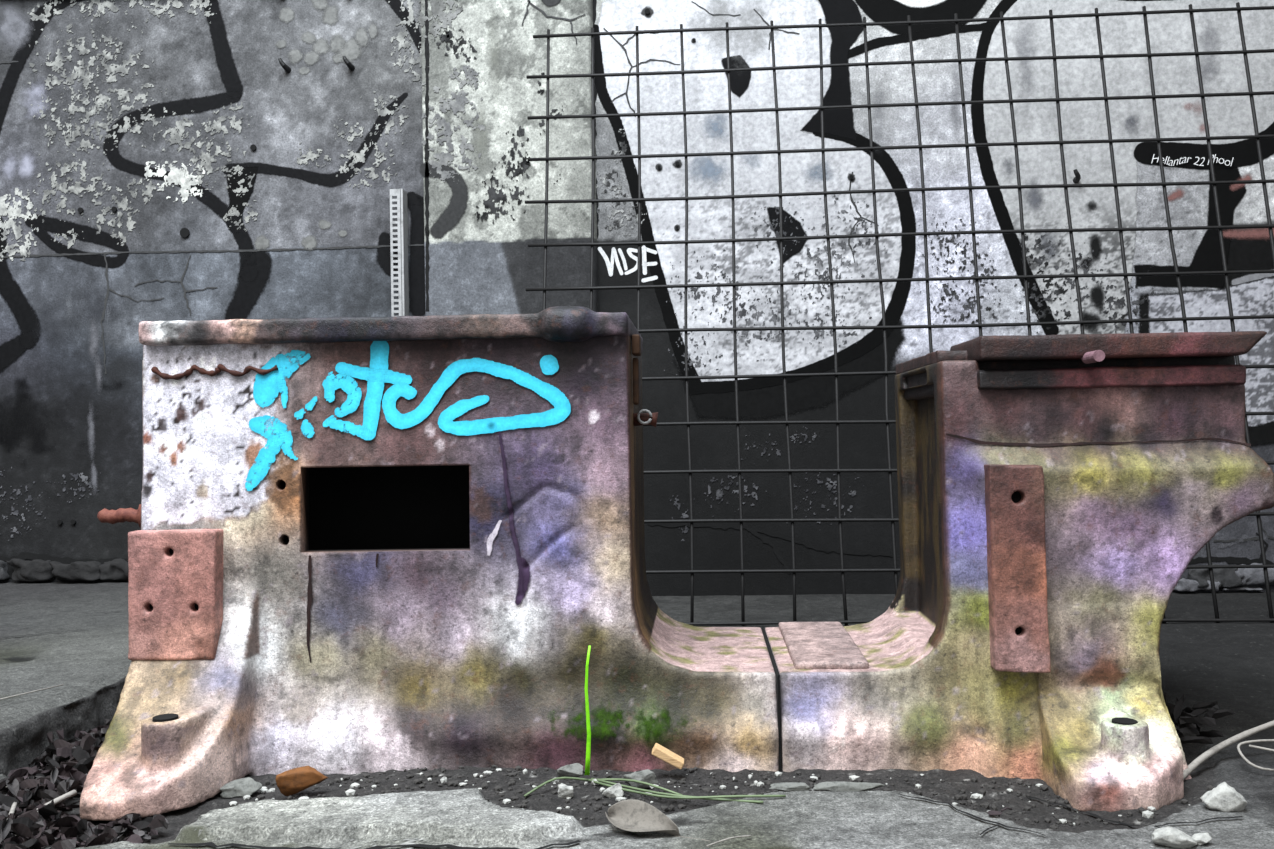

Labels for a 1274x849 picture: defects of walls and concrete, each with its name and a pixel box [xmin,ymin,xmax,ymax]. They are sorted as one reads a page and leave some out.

peeling [0,0,269,261]